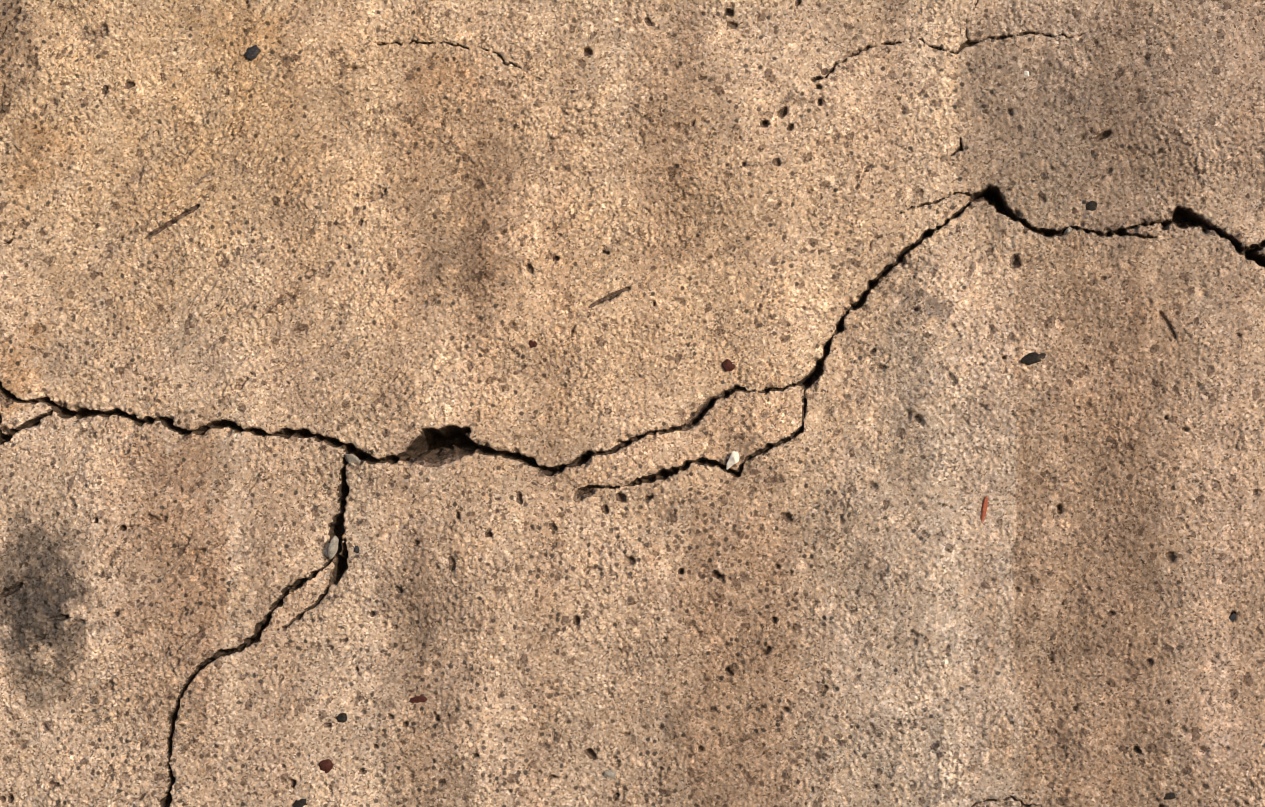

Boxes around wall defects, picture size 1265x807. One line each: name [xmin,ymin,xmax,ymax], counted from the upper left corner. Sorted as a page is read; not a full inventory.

crack [811,0,1083,82]
crack [950,138,964,157]
crack [476,192,1265,491]
leakage [1,535,81,680]
crack [0,381,411,807]
crack [971,796,1035,807]